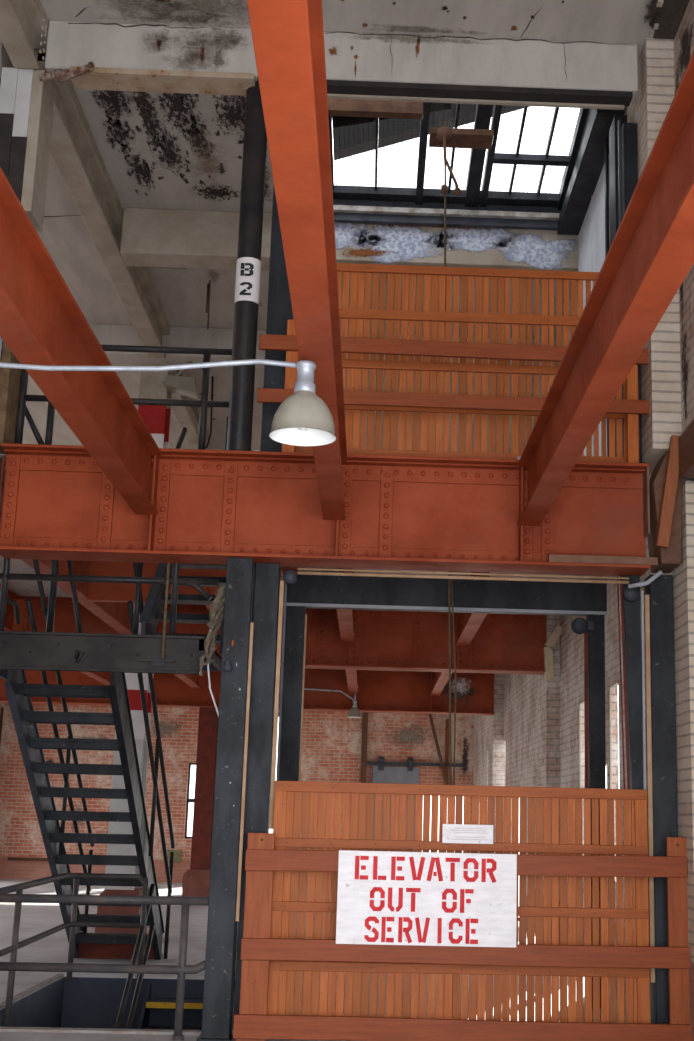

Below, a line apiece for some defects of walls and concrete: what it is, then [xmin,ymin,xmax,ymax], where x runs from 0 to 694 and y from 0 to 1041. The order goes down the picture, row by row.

water stain [119,0,248,70]
crack [325,6,635,80]
peeling [334,222,578,269]